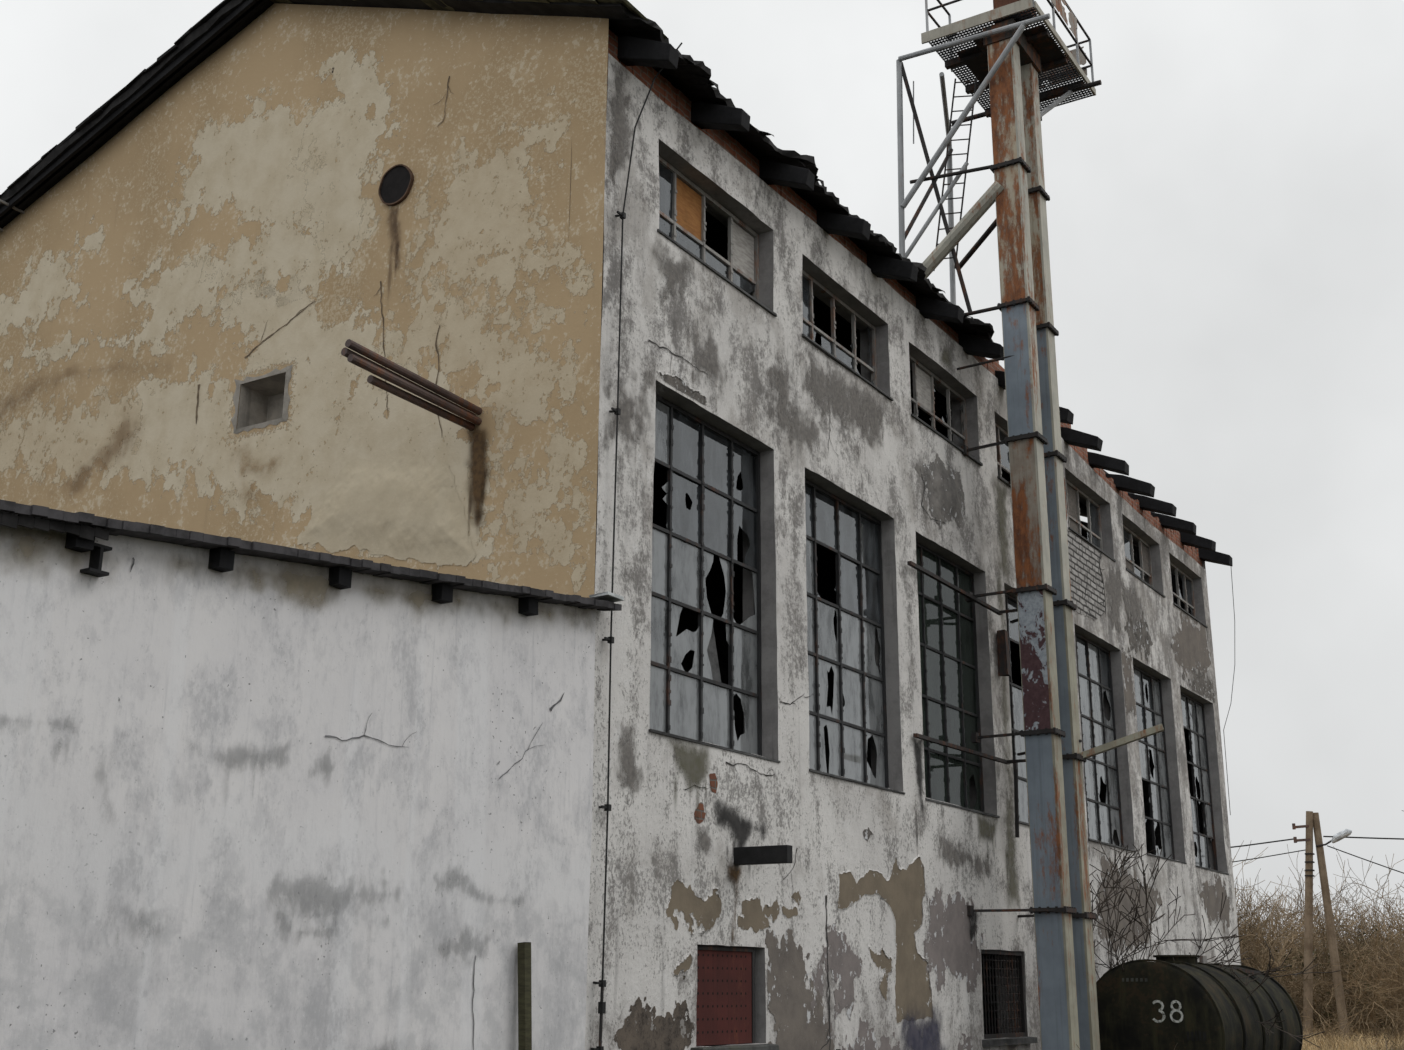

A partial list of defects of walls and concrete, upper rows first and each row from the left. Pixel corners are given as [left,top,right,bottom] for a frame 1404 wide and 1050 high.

water stain [609,65,634,183]
water stain [661,249,694,299]
peeling [0,45,596,593]
water stain [695,330,727,381]
water stain [605,371,653,447]
water stain [767,353,883,449]
crack [325,713,416,747]
crack [499,694,564,779]
flaking render [663,878,722,980]
flaking render [738,854,983,1050]
flaking render [612,997,695,1050]